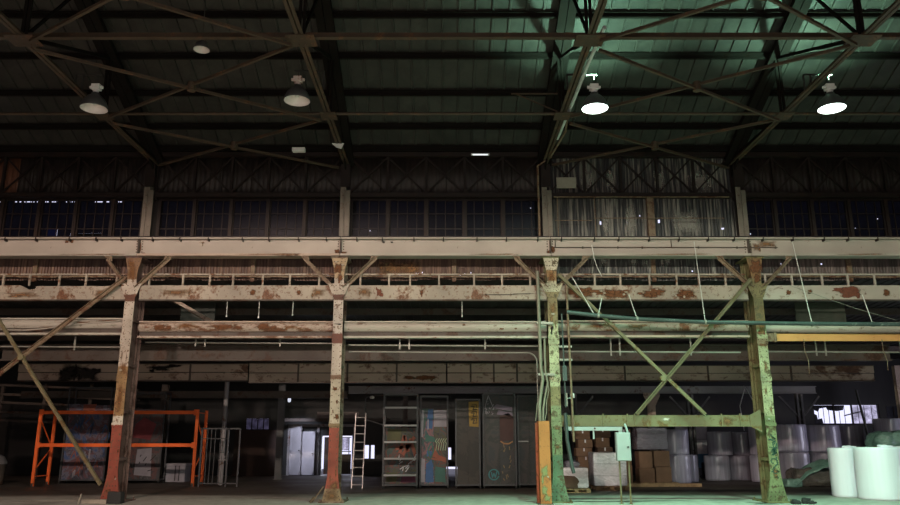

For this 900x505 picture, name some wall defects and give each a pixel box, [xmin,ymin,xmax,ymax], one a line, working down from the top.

peeling [542,466,551,501]